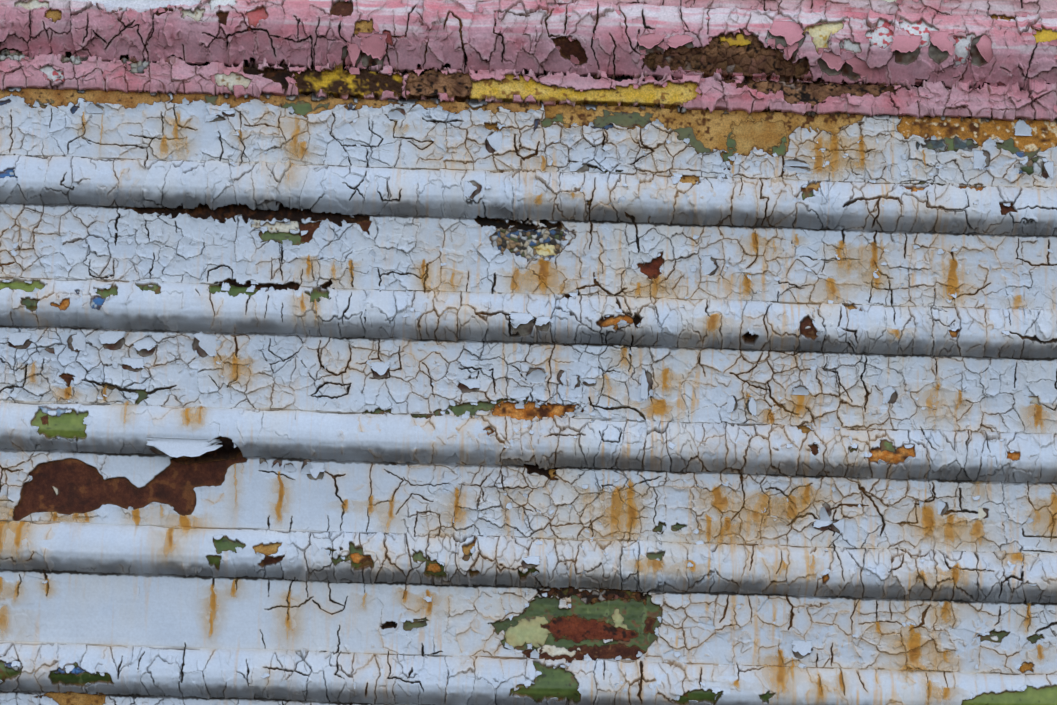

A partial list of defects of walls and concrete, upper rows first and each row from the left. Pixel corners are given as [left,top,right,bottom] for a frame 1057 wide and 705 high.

peeling [15,0,268,41]
crack [196,248,435,399]
peeling [475,216,576,263]
crack [547,135,652,443]
crack [802,149,969,320]
corrosion [0,437,247,555]
corrosion [606,480,638,536]
corrosion [706,487,732,543]
crack [731,473,1057,633]
corrosion [921,506,959,542]
peeling [488,539,662,703]
peeling [962,684,1057,705]